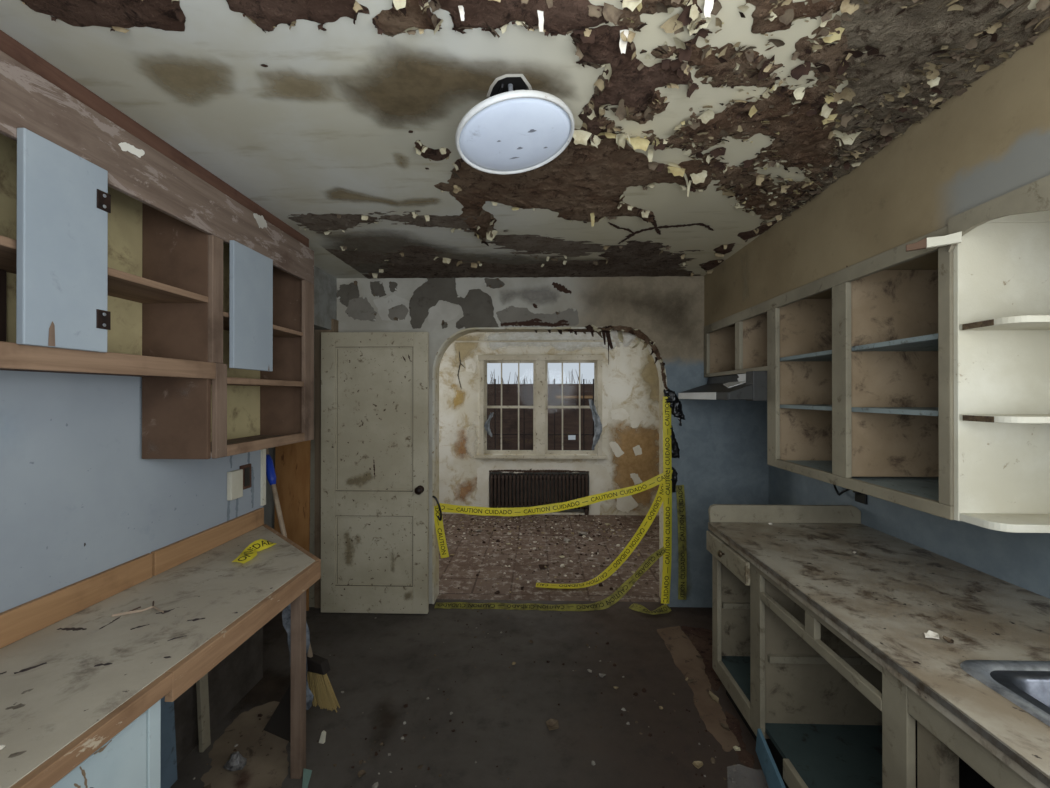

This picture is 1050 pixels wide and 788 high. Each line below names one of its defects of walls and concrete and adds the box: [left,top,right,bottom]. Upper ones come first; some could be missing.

peeling [21,0,186,33]
water stain [268,73,328,99]
water stain [346,54,563,123]
peeling [226,0,1050,390]
crack [608,215,714,244]